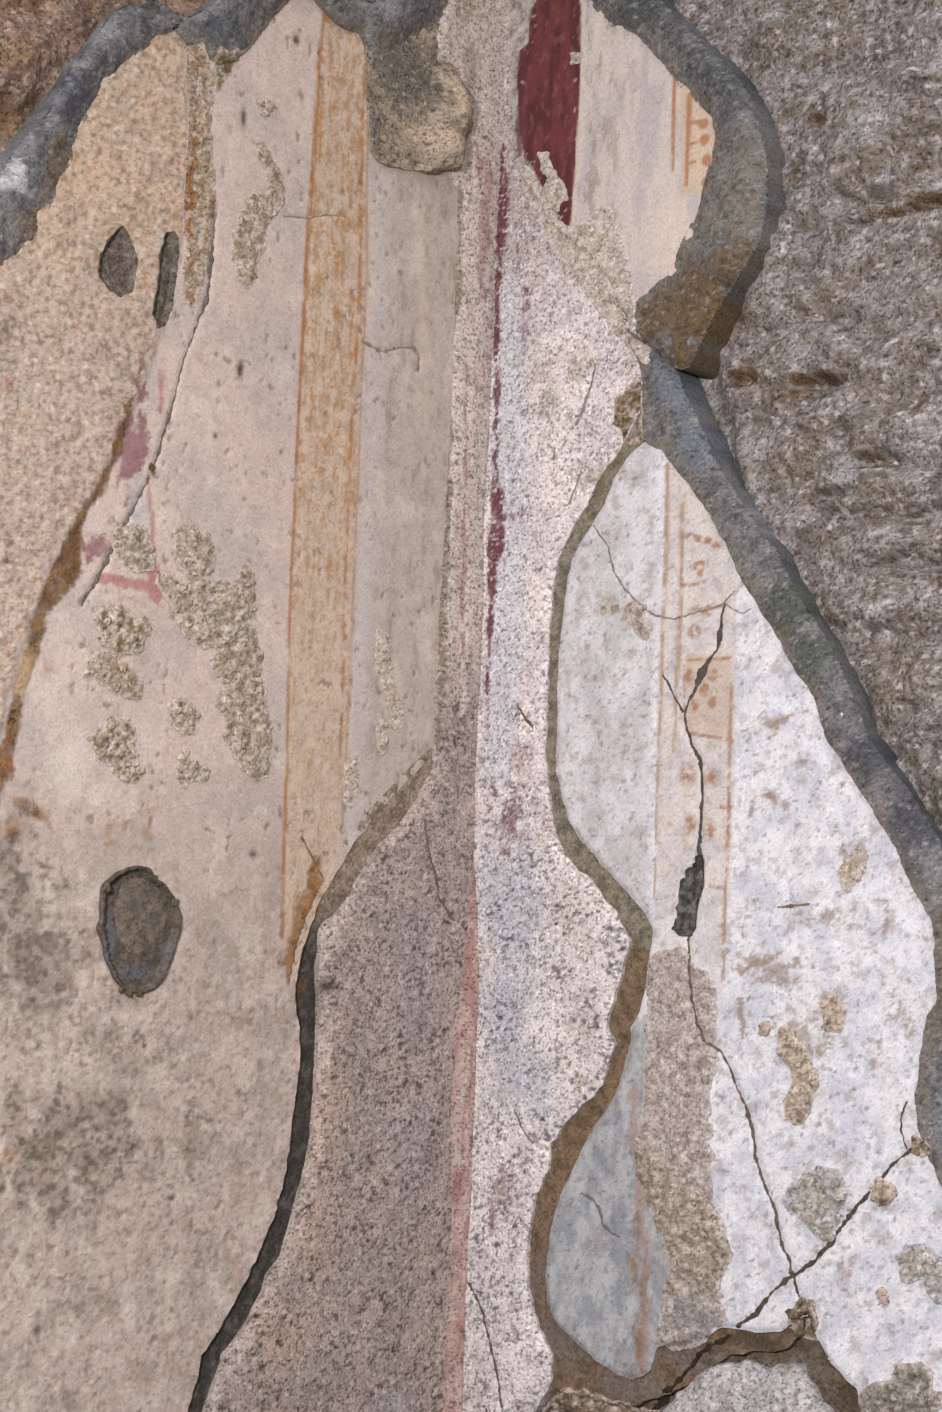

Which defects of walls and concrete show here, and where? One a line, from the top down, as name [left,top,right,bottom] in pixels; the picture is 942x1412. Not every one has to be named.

peeling [98,225,138,297]
spalling [518,151,651,445]
crack [576,363,597,425]
spalling [82,603,153,784]
spalling [111,520,273,789]
crack [566,473,751,843]
crack [777,901,810,909]
crack [581,1192,619,1237]
spalling [634,947,733,1351]
crack [648,937,912,1412]
spalling [757,1020,820,1125]
spalling [858,1361,942,1412]